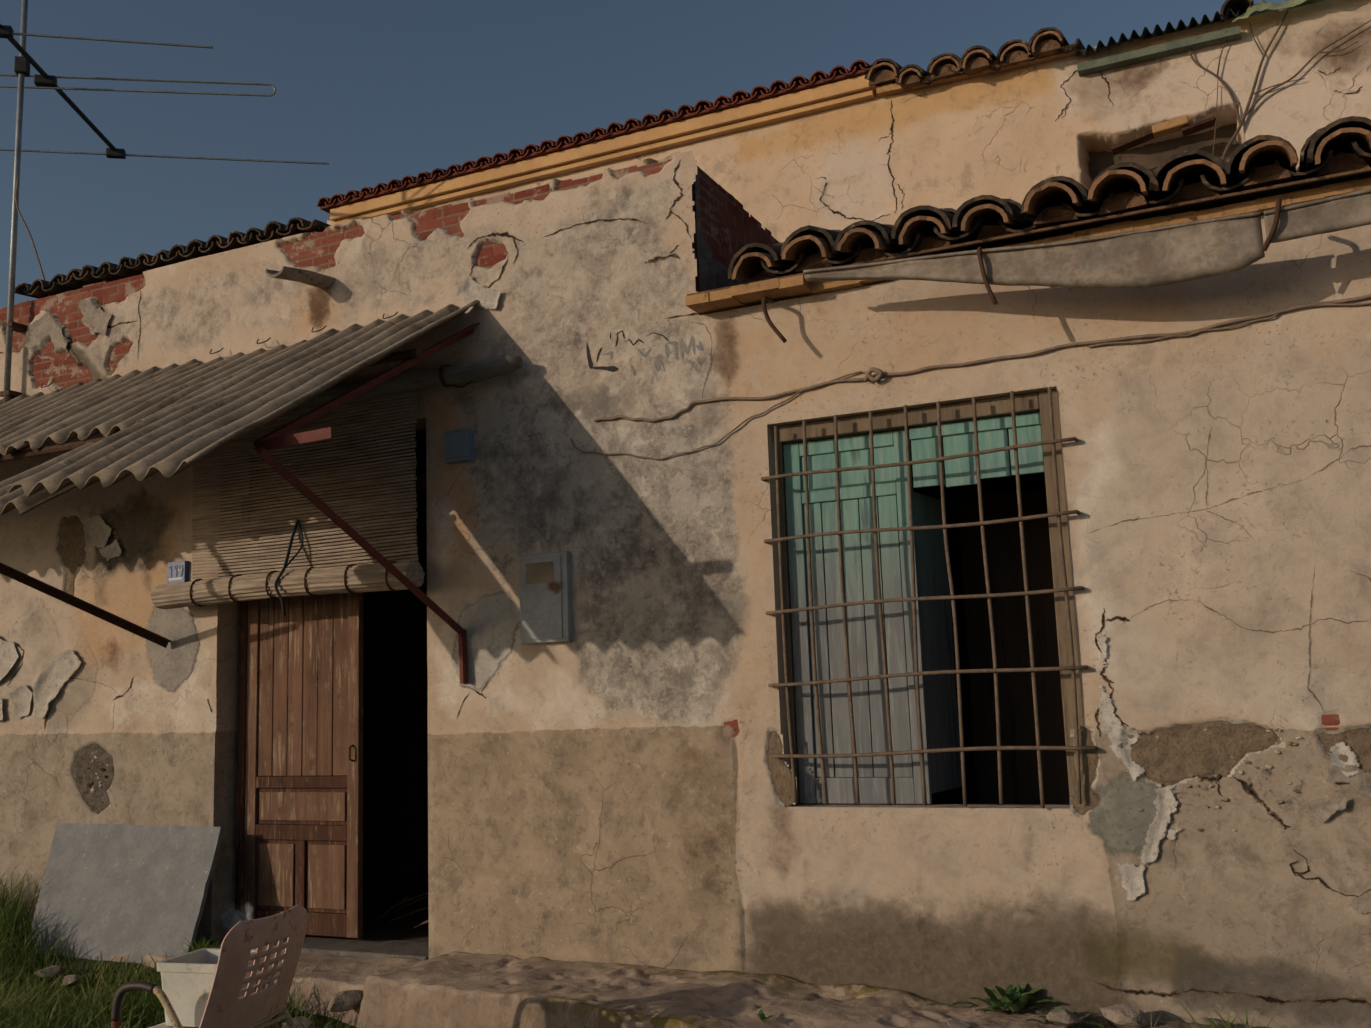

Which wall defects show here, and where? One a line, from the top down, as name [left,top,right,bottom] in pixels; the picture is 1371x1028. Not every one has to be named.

crack [1055,70,1113,121]
crack [817,100,905,221]
spalling [389,159,672,309]
crack [468,161,691,288]
spalling [0,274,146,390]
damp [101,491,170,573]
crack [1085,427,1371,534]
peeling [0,639,82,720]
peeling [146,607,199,692]
crack [1095,567,1369,736]
spalling [1069,632,1371,901]
damp [742,907,1122,1014]